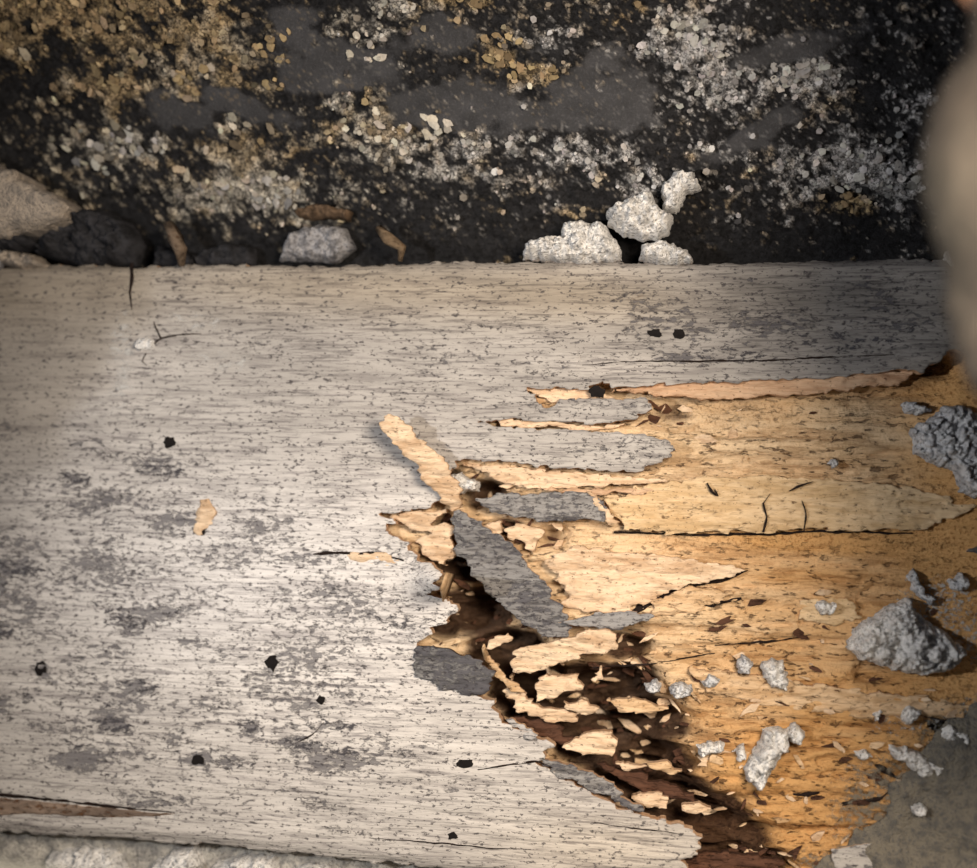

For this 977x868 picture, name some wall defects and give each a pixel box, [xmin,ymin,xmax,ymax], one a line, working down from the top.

peeling [831,843,872,868]